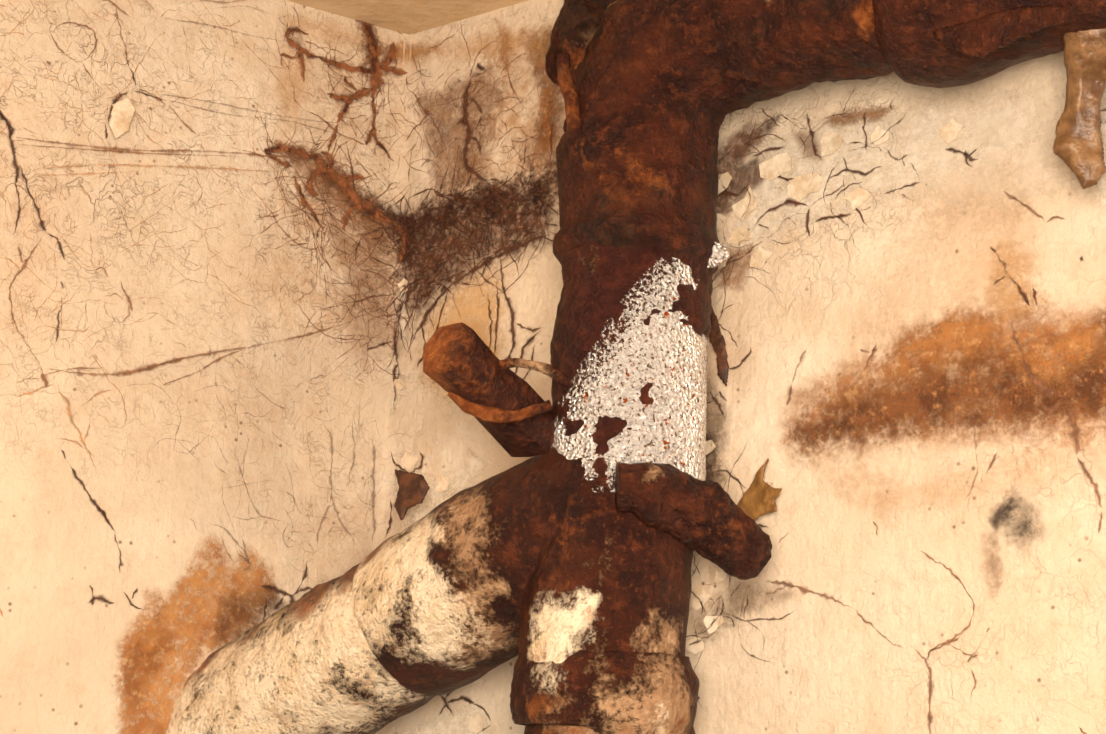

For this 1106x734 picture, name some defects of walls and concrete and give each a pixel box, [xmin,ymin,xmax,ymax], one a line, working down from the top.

crack [47,0,197,138]
damp [285,152,547,262]
crack [748,112,919,237]
crack [946,148,977,168]
crack [1005,192,1063,222]
crack [0,111,141,609]
rust [789,309,1106,453]
rust [119,542,275,734]
crack [771,581,890,642]
crack [918,551,989,734]